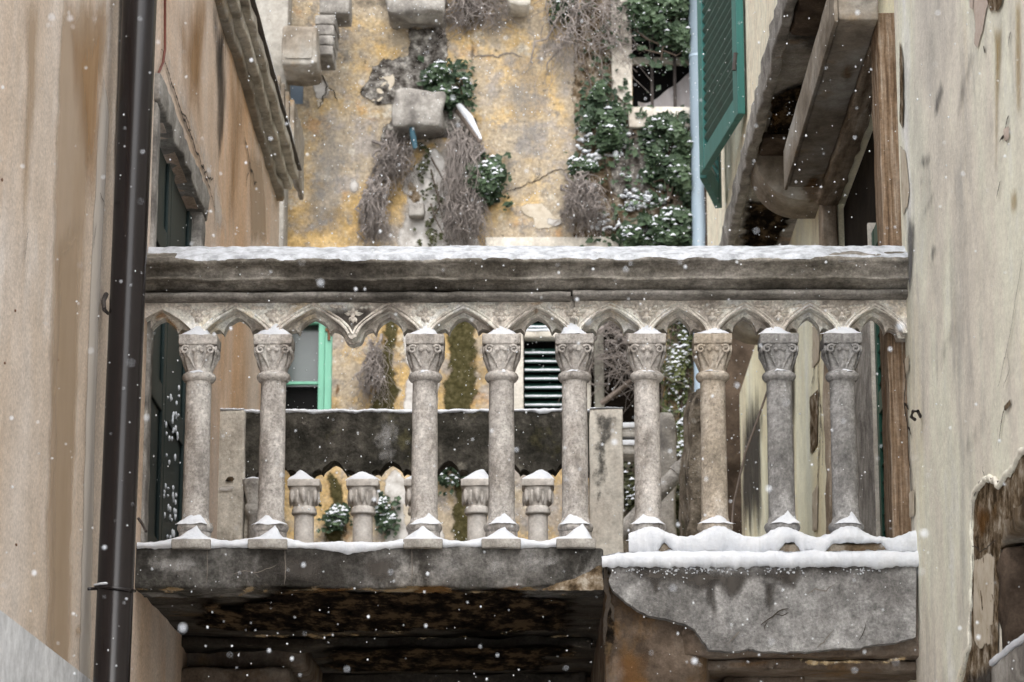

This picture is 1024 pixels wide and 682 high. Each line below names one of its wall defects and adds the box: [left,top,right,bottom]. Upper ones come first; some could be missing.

flaking render [360,27,479,247]
crack [503,168,568,194]
damp [47,0,122,679]
damp [633,570,750,610]
damp [763,570,799,607]
flaking render [956,447,1024,682]